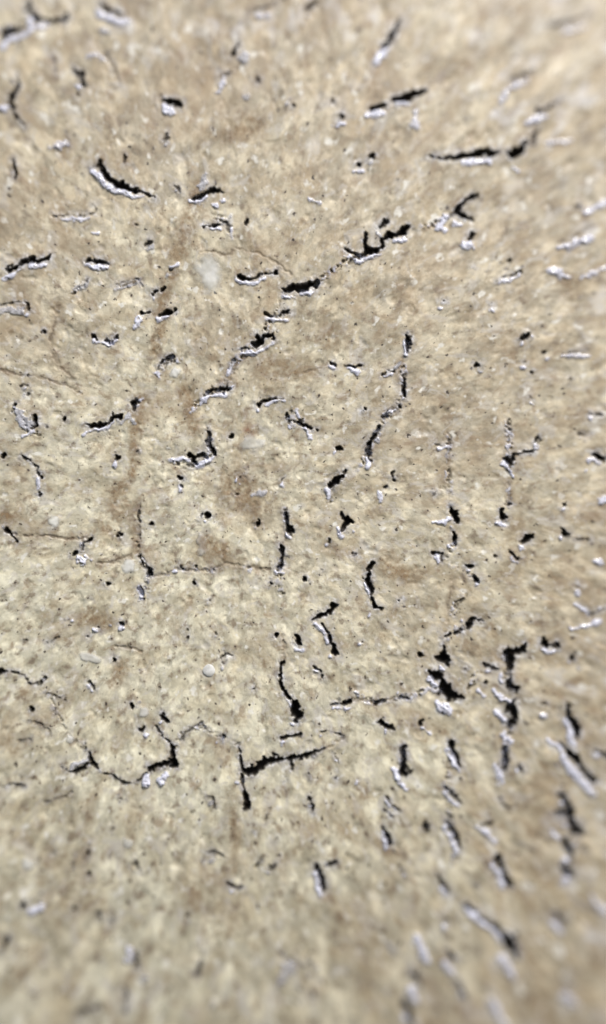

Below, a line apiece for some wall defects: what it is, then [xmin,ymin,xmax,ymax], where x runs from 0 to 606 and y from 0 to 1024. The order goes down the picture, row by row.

crack [90,159,155,199]
crack [429,104,573,173]
crack [170,193,480,468]
crack [324,334,412,502]
crack [66,724,205,788]
crack [235,507,526,981]